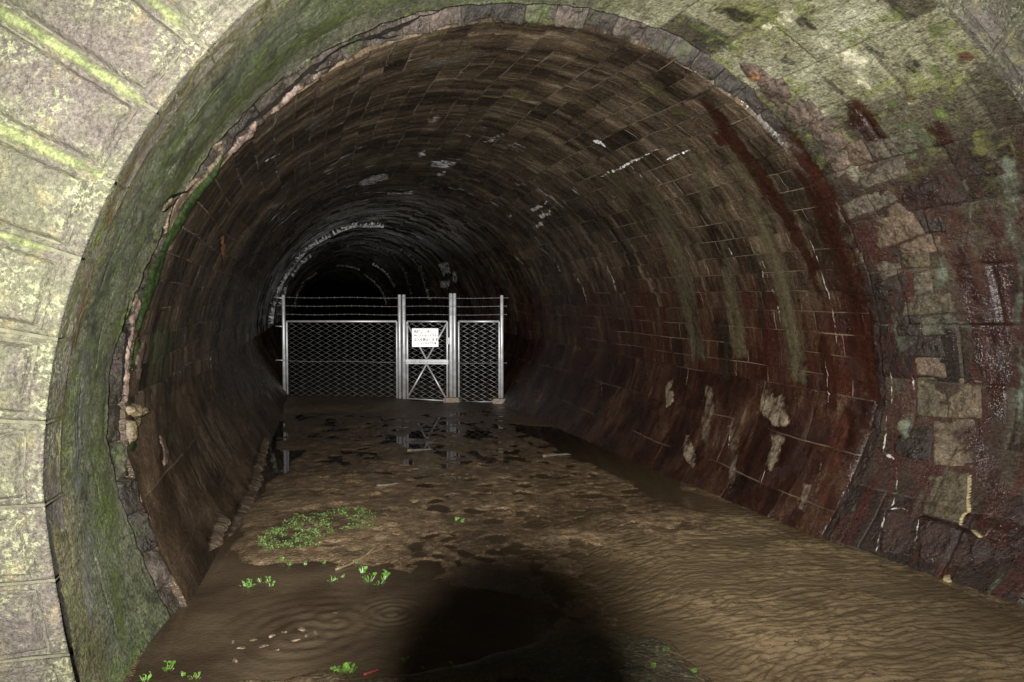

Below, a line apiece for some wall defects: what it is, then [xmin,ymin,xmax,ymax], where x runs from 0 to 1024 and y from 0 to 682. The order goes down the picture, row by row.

flaking render [270,69,328,115]
crack [222,6,450,158]
corrosion [843,98,885,140]
corrosion [927,121,955,146]
crack [160,181,197,228]
flaking render [162,121,257,234]
water stain [727,143,806,382]
water stain [720,242,746,380]
flaking render [123,294,150,444]
spalling [665,381,674,407]
spalling [683,386,714,465]
spalling [760,391,789,471]